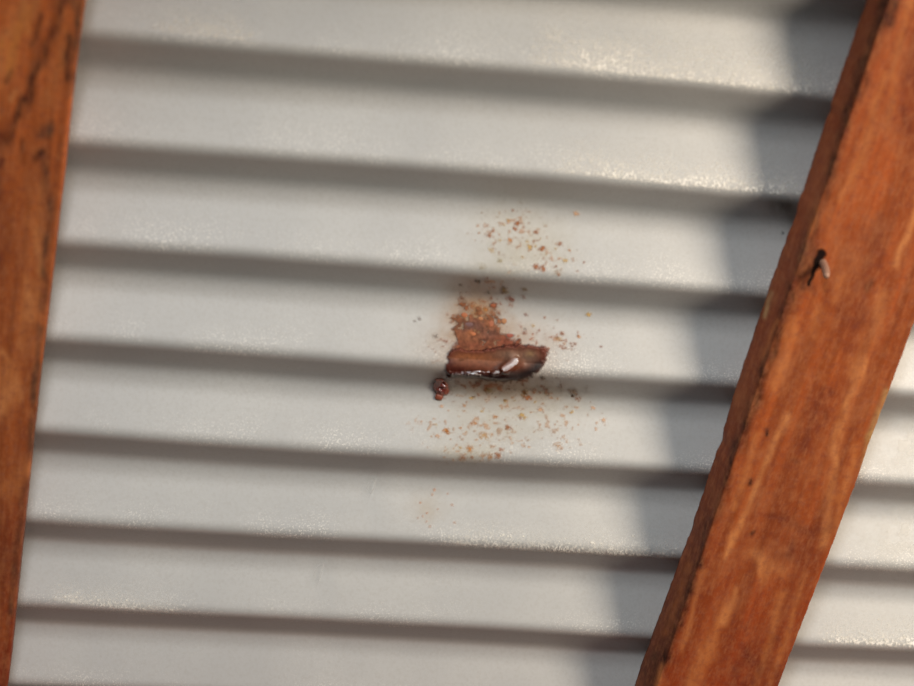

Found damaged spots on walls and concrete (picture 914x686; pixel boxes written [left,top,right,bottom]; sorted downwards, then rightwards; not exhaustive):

corrosion [433,301,549,400]